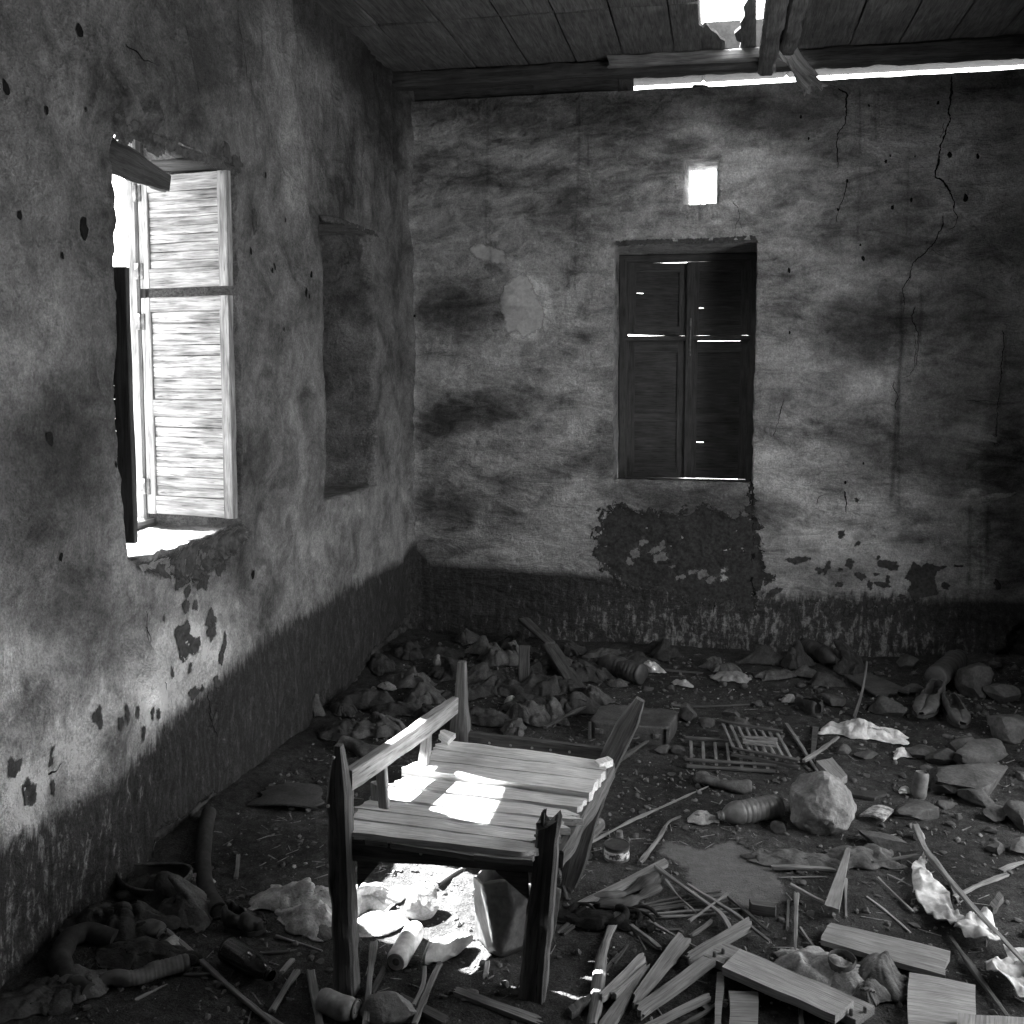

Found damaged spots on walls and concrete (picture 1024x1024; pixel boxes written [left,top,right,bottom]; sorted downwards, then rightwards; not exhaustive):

crack [836,88,849,222]
crack [892,76,958,409]
spalling [136,523,252,700]
spalling [590,483,783,616]
peeling [786,555,963,618]
peeling [8,756,37,806]
peeling [92,705,103,730]
peeling [118,704,165,742]